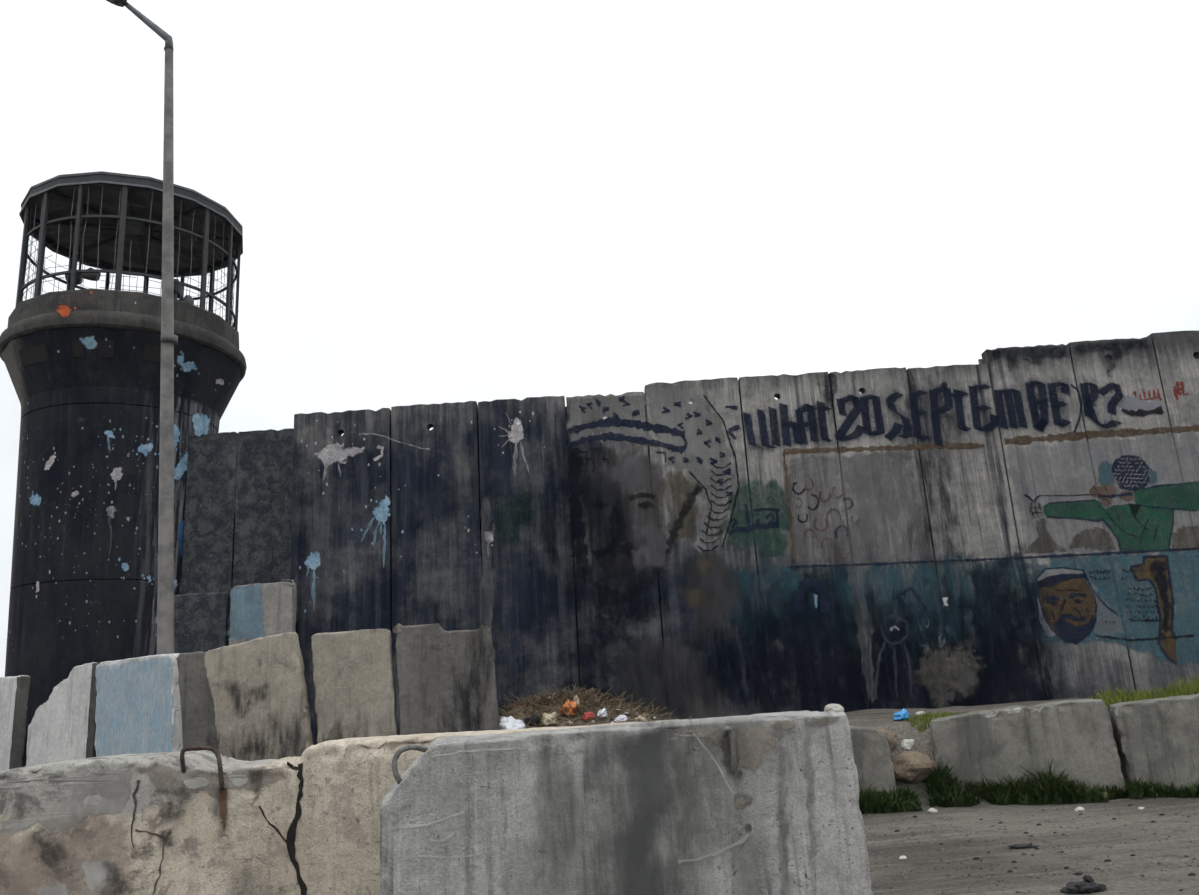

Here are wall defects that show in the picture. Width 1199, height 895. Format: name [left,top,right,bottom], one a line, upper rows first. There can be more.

crack [131,780,171,895]
rust [219,789,227,830]
crack [259,761,307,895]